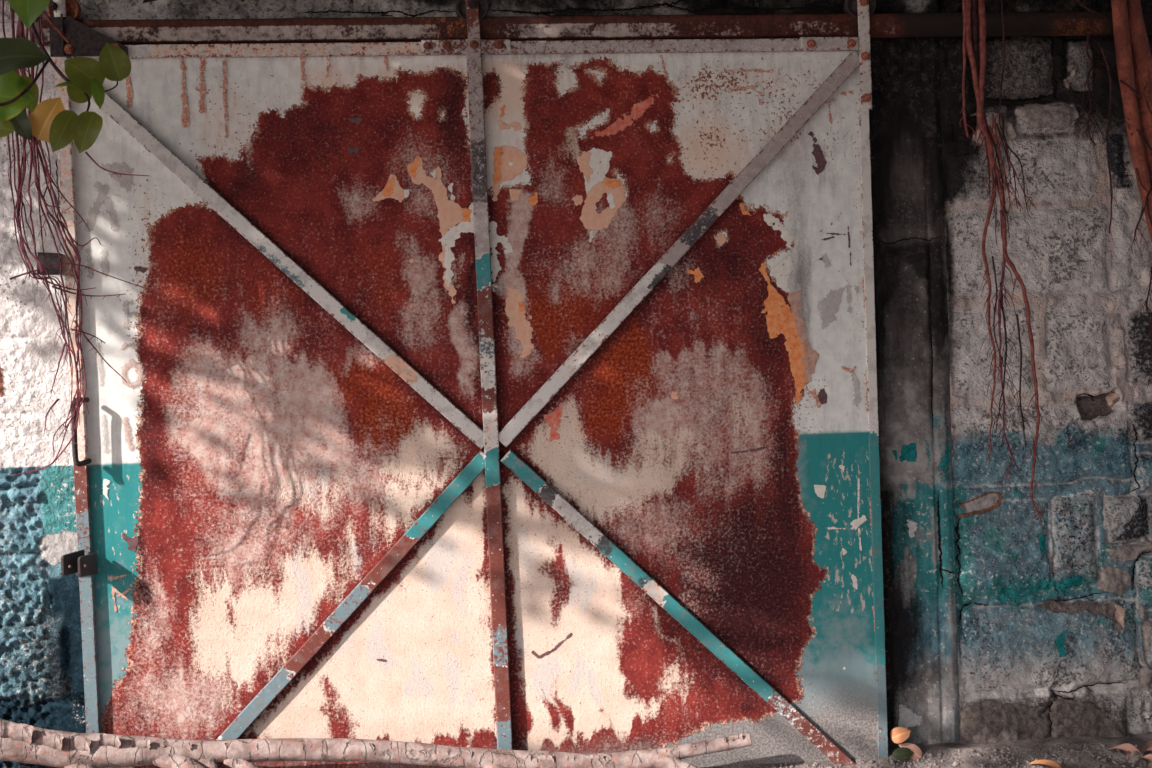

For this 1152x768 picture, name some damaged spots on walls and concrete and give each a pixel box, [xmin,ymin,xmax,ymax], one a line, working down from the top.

corrosion [125,76,133,108]
corrosion [180,56,483,430]
damp [879,147,953,357]
corrosion [482,55,829,754]
spalling [1076,391,1120,420]
corrosion [100,201,497,749]
peeling [814,485,826,498]
peeling [850,515,867,530]
damp [880,491,922,739]
crack [937,493,987,623]
spalling [956,492,1003,518]
crack [1043,682,1127,737]